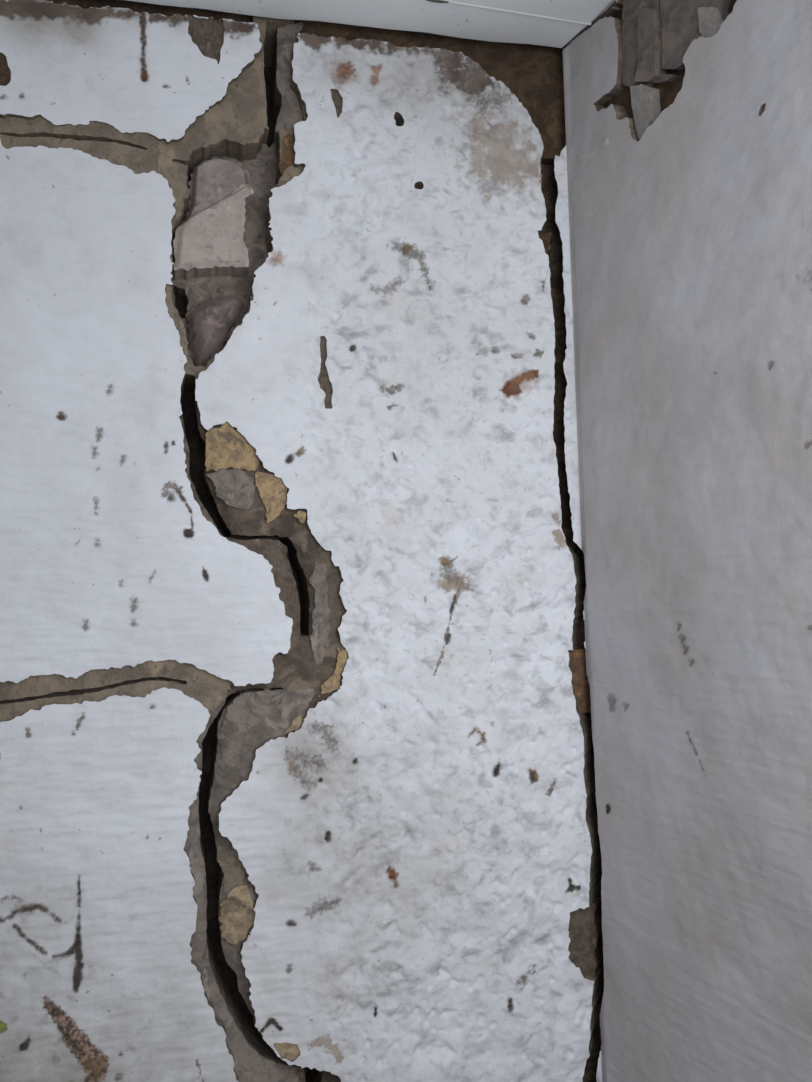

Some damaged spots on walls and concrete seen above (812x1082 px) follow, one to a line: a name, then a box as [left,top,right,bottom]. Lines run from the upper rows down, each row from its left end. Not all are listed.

crack [15,136,133,147]
crack [186,164,194,181]
crack [264,66,275,148]
flaking render [442,39,566,165]
flaking render [603,0,737,139]
crack [539,164,591,717]
flaking render [0,14,348,1082]
crack [182,391,302,632]
crack [0,677,187,704]
crack [236,686,282,694]
crack [199,719,283,1034]
crack [568,859,604,1082]